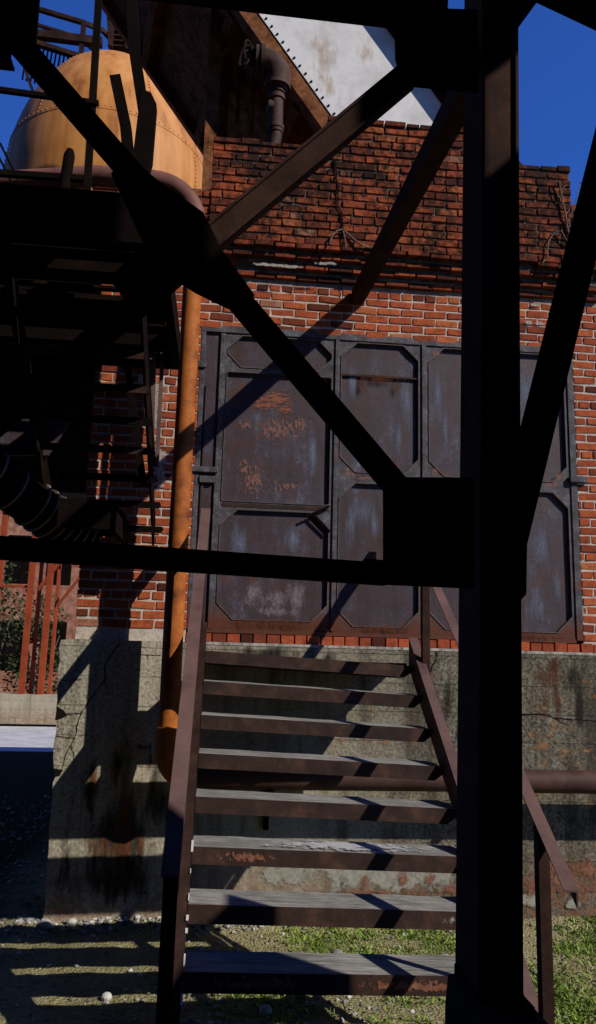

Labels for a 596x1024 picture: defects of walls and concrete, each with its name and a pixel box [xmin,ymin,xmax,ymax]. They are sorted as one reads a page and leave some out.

crack [56,642,161,770]
crack [522,713,592,724]
damp [87,795,145,898]
corrosion [216,852,274,863]